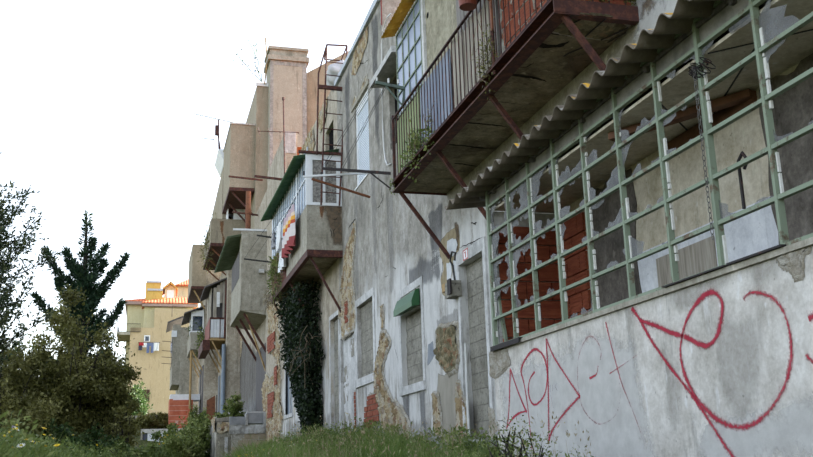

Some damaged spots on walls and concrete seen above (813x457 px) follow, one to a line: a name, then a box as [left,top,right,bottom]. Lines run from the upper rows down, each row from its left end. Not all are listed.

spalling [351,26,368,107]
crack [512,33,569,82]
spalling [337,220,356,357]
spalling [776,246,812,282]
spalling [261,301,284,443]
spalling [343,303,412,439]
spalling [427,321,468,453]